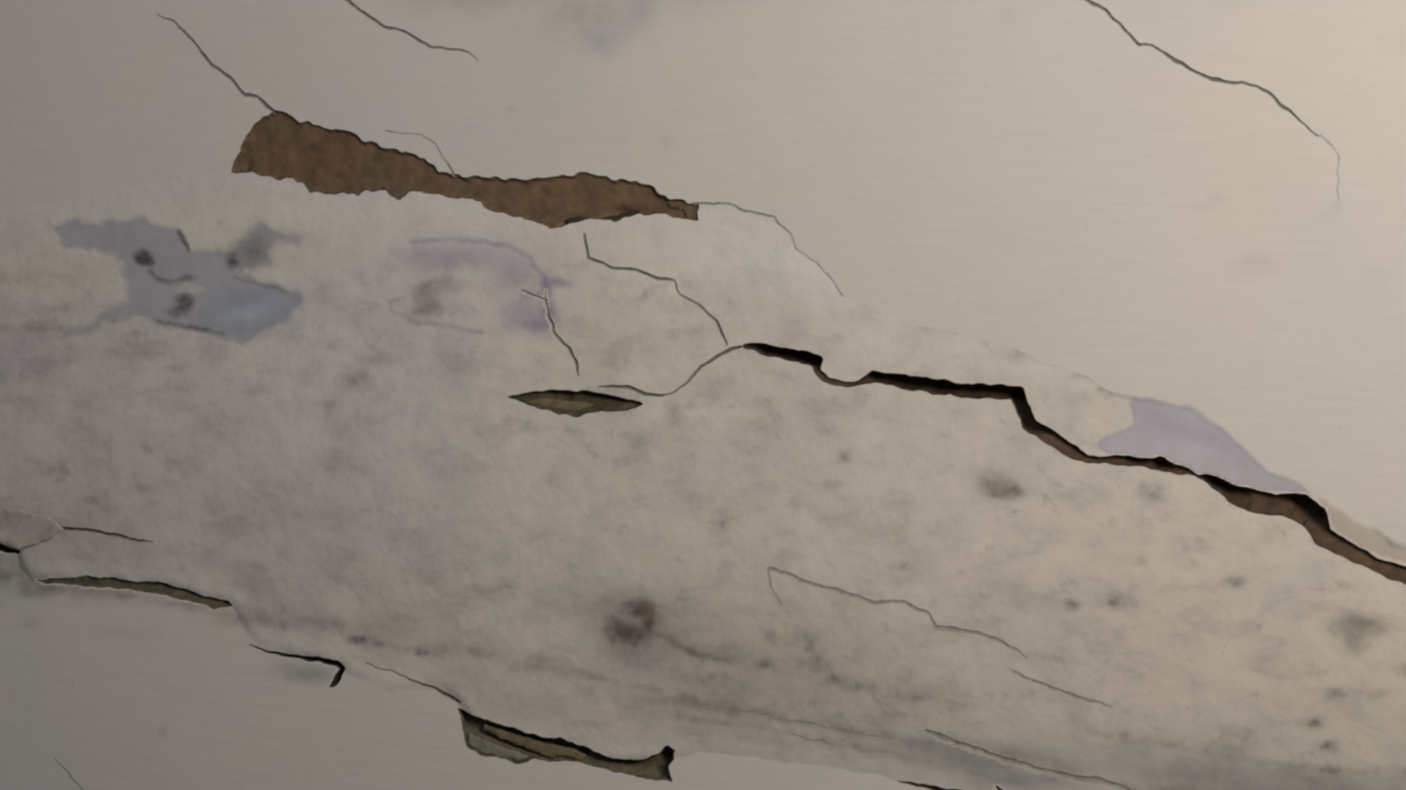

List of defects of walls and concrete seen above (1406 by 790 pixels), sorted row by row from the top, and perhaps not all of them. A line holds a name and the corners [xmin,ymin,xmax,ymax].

crack [157,14,277,114]
crack [345,0,478,61]
crack [1084,0,1340,201]
flaking render [231,110,699,229]
peeling [56,220,299,342]
crack [693,202,843,297]
flaking render [508,389,643,417]
crack [520,233,1406,585]
peeling [1100,399,1305,491]
crack [0,509,232,609]
crack [767,566,1112,708]
flaking render [366,662,675,782]